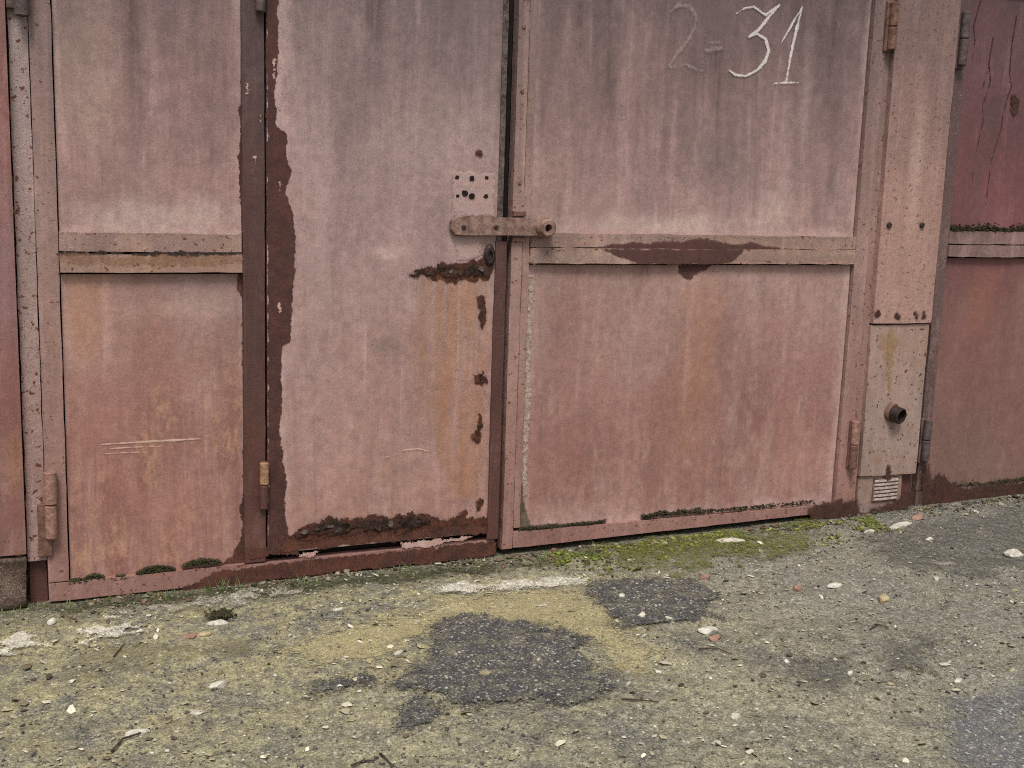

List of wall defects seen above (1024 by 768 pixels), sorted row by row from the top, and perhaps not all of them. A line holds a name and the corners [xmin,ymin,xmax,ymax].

crack [970,0,1017,195]
rust [409,254,495,285]
rust [285,511,487,542]